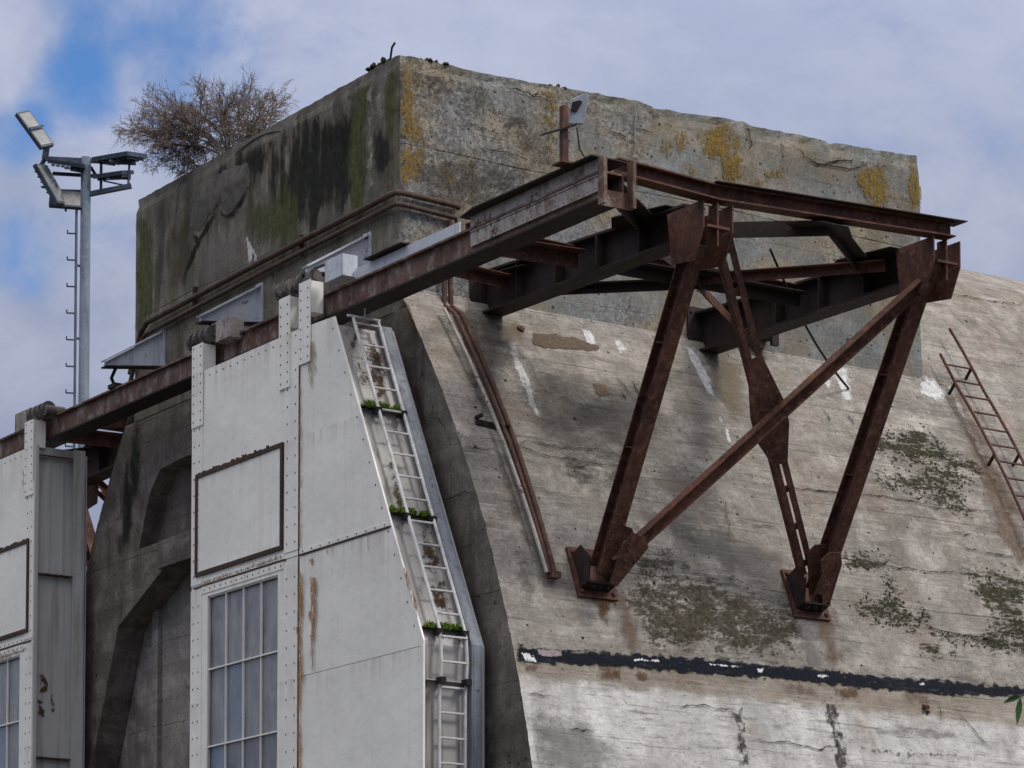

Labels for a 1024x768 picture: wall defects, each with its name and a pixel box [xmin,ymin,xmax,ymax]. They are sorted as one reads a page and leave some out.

leakage [218,69,396,232]
crack [792,146,869,170]
rust [299,342,316,548]
rust [296,558,316,768]
crack [664,704,746,712]
crack [759,739,837,750]